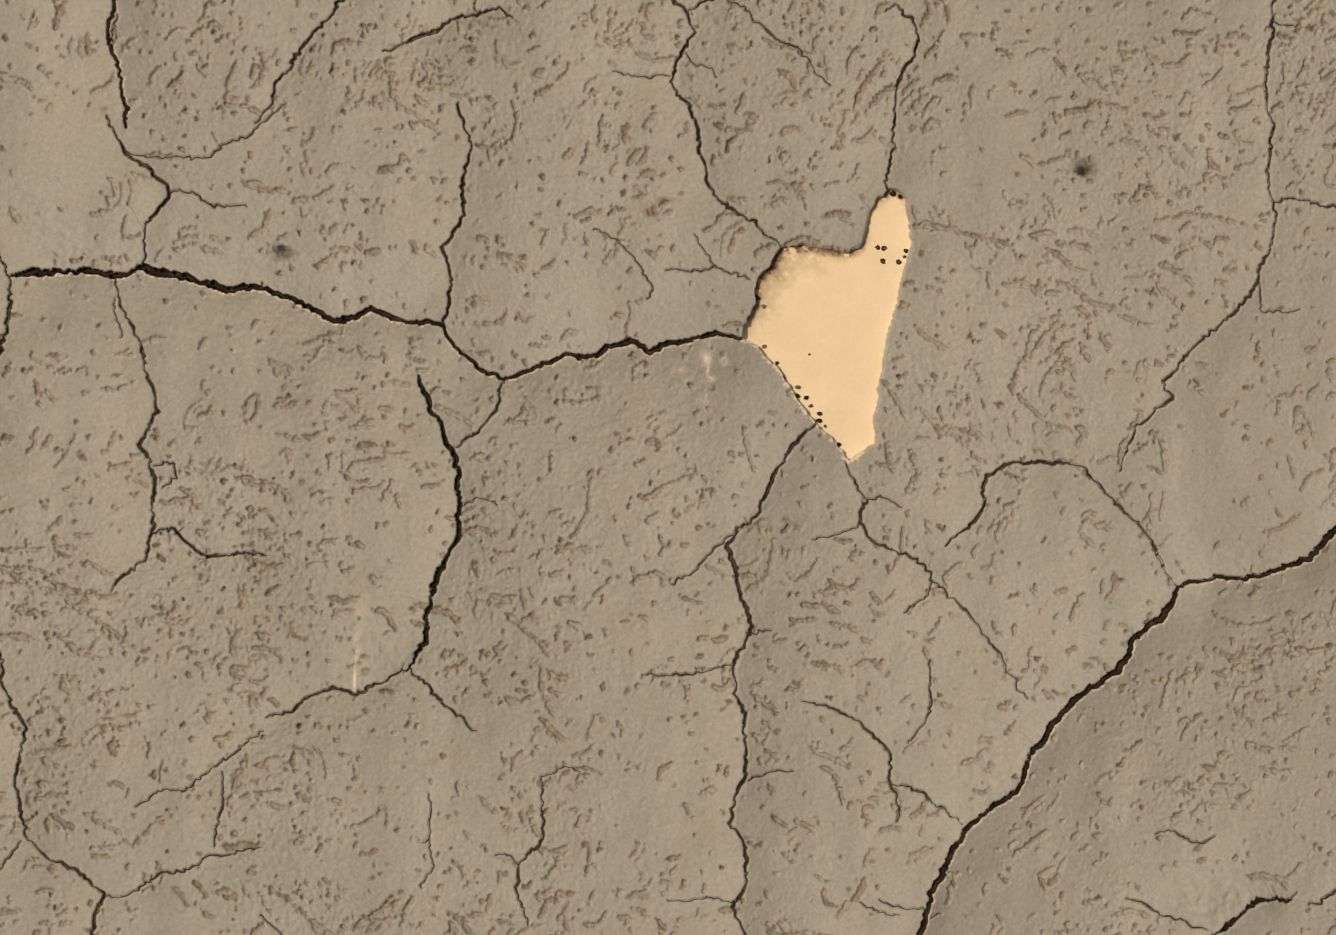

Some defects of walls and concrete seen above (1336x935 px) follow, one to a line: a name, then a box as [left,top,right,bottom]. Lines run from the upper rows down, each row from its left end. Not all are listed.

crack [0,0,750,935]
crack [613,0,831,246]
crack [642,424,816,935]
spalling [742,190,911,459]
crack [802,0,1336,935]